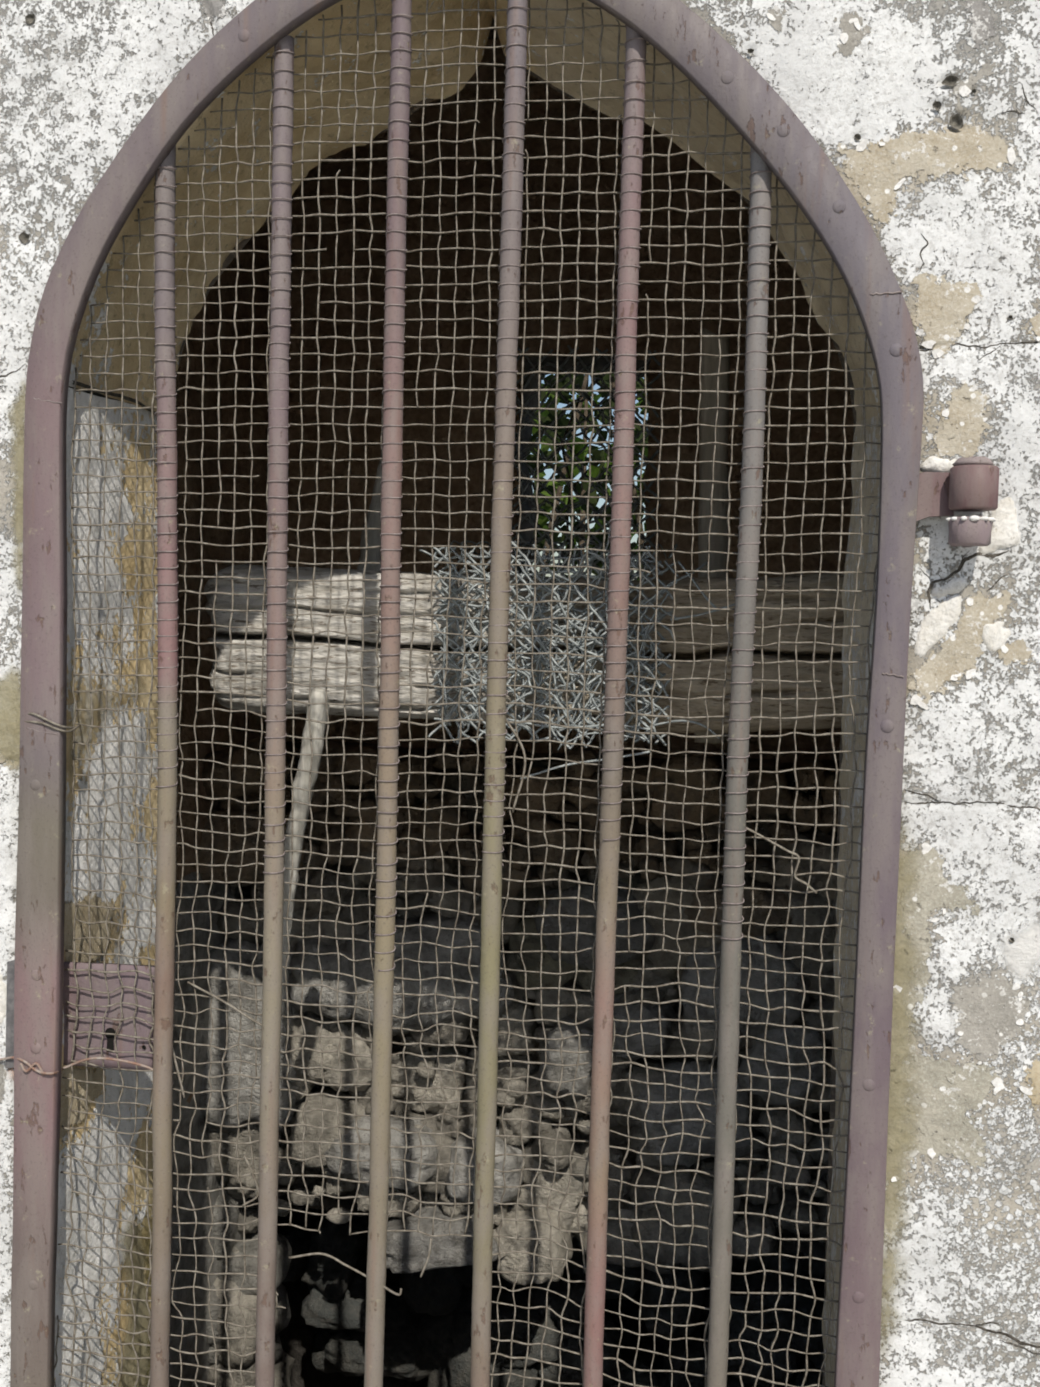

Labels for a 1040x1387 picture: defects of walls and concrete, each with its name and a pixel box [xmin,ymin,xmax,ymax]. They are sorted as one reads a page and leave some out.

peeling [833,11,871,57]
peeling [837,62,1016,225]
peeling [910,272,983,358]
peeling [1008,313,1040,343]
crack [919,550,1009,609]
peeling [891,842,1040,1184]
crack [905,1318,1040,1355]